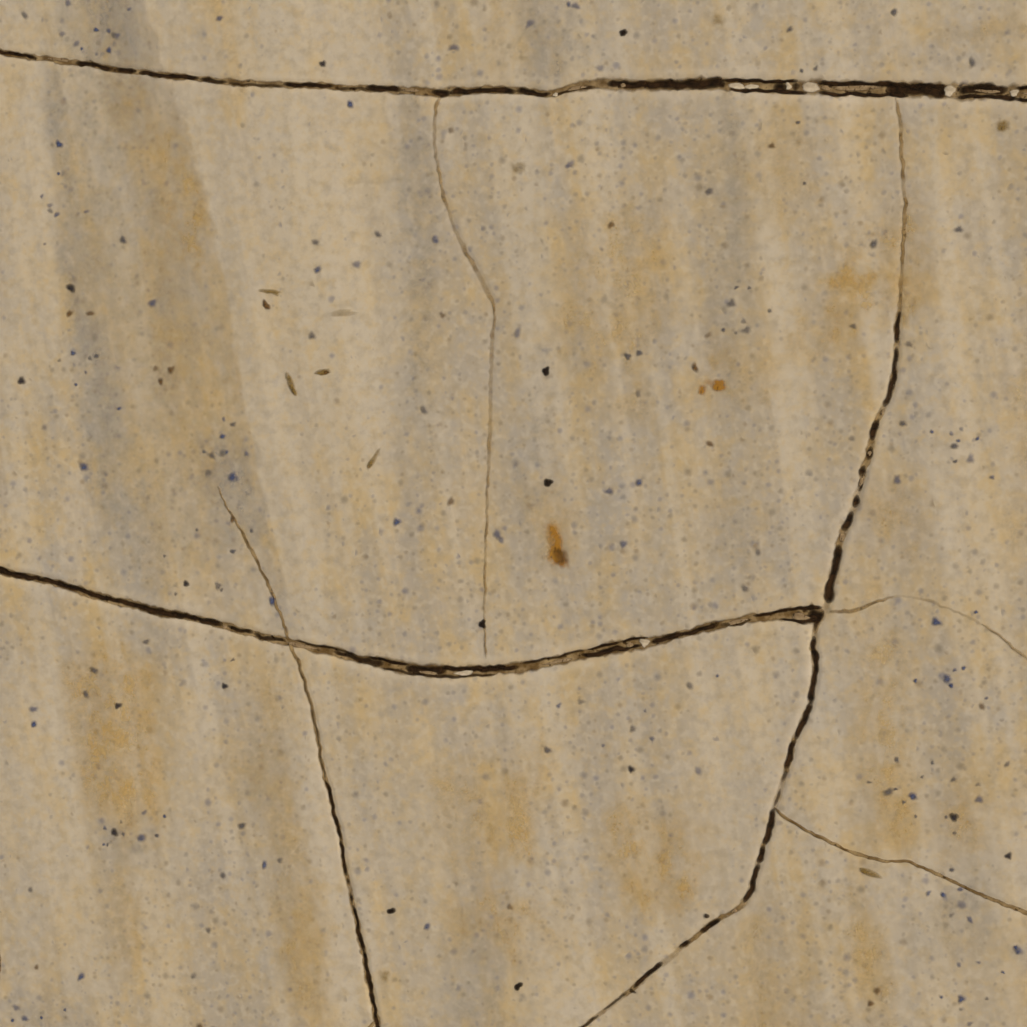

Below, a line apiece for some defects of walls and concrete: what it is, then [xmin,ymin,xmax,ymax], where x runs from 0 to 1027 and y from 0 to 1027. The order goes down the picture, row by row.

crack [0,49,1027,178]
crack [437,167,446,203]
crack [463,247,477,270]
crack [900,197,908,267]
rust [550,526,565,565]
crack [0,283,1027,1027]